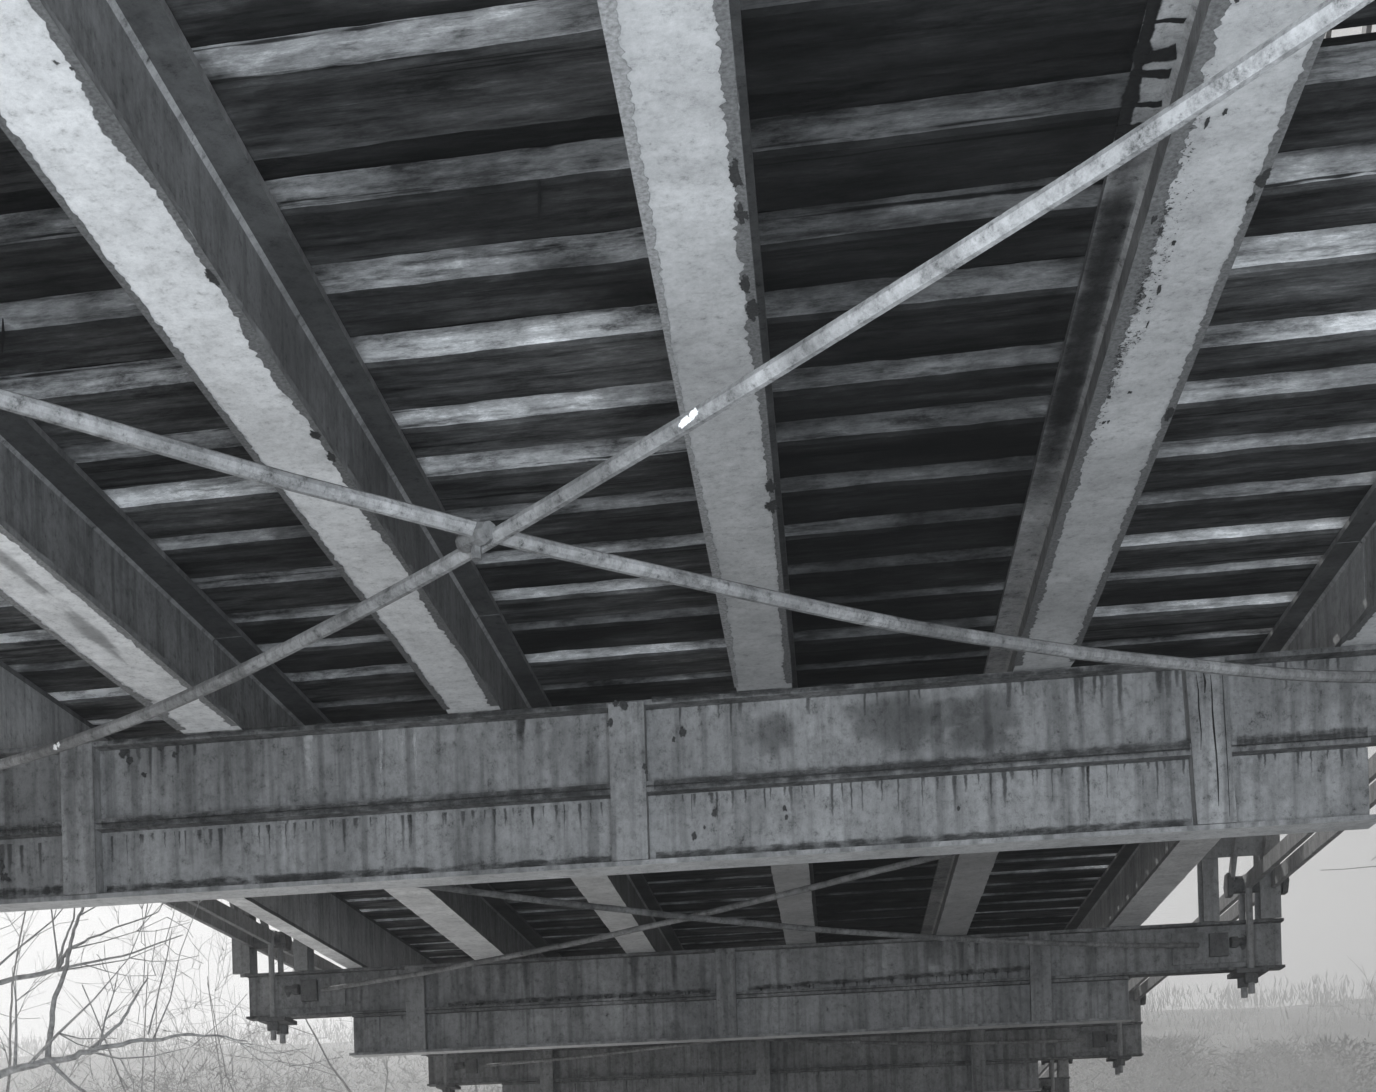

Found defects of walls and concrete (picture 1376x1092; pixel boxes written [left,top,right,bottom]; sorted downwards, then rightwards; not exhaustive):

peeling [712,0,763,370]
peeling [1182,0,1239,97]
peeling [755,387,793,683]
peeling [1014,109,1228,666]
peeling [1345,604,1376,641]